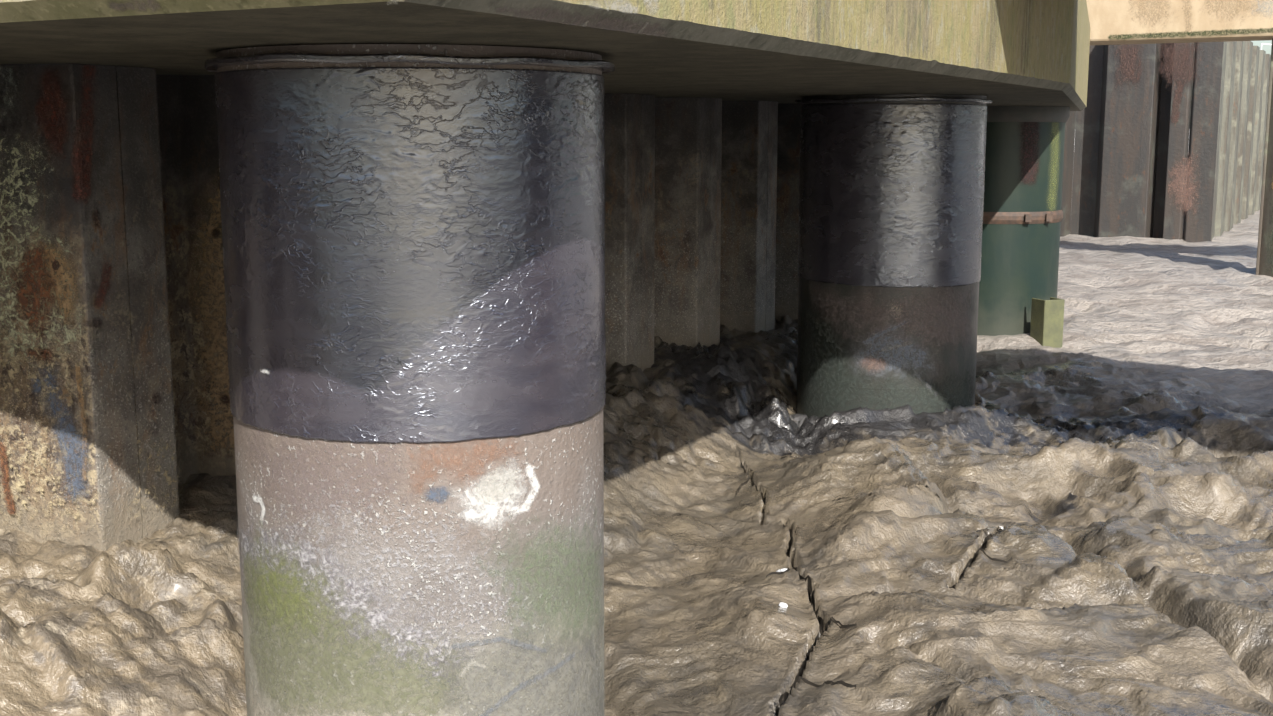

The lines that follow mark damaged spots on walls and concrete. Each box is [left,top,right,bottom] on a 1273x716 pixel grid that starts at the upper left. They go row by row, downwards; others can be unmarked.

rust [14,242,87,498]
peeling [464,509,483,520]